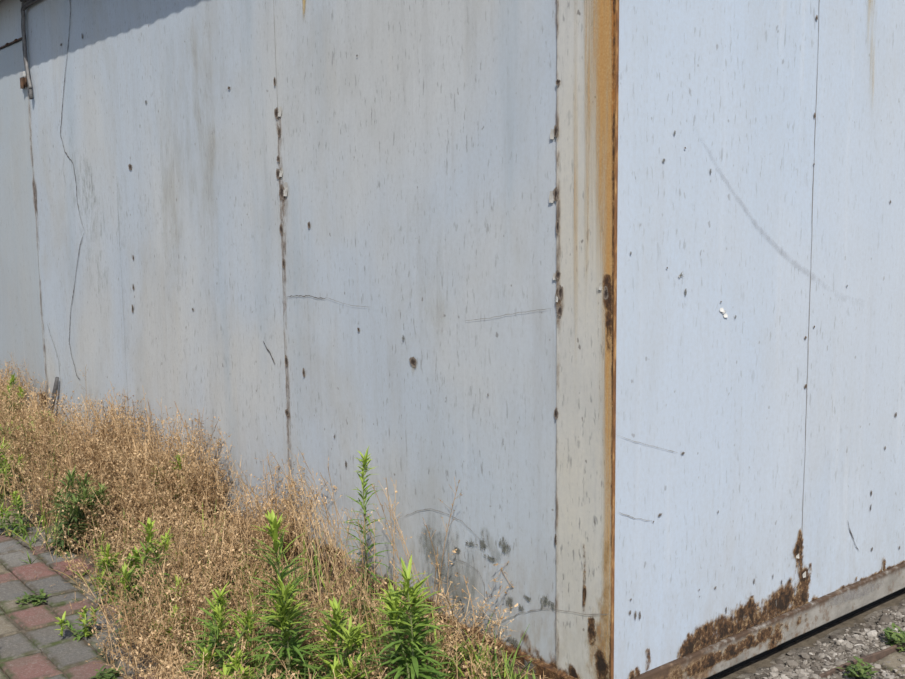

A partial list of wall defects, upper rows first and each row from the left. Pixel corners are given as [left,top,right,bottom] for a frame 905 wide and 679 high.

rust [629,649,651,679]
rust [673,529,818,679]